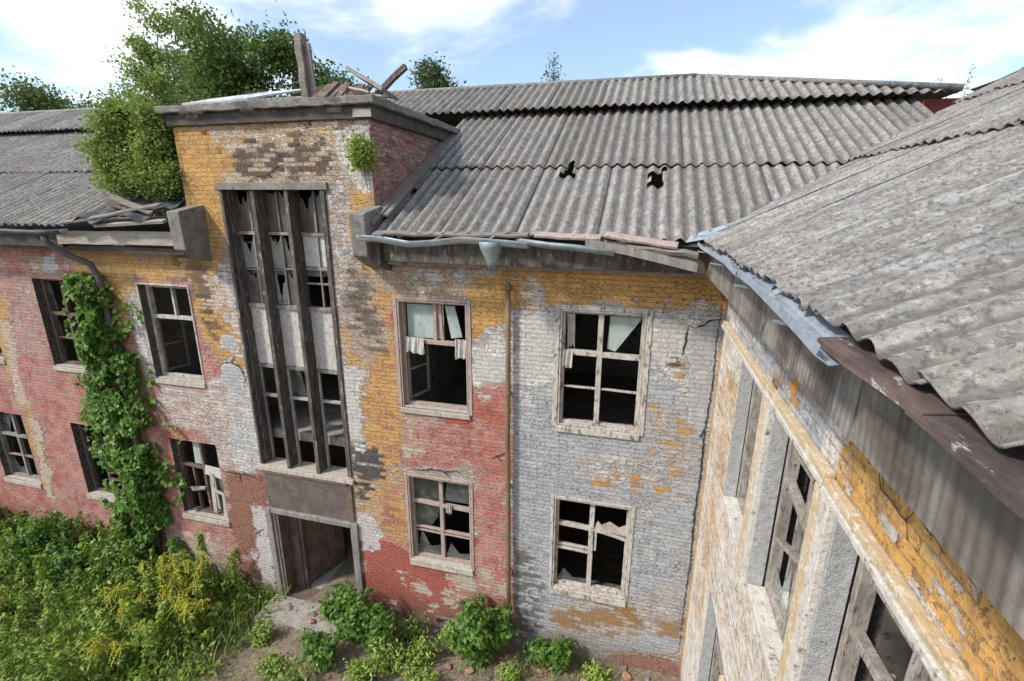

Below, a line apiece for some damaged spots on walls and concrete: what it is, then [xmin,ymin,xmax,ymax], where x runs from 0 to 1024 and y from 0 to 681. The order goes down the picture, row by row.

spalling [219,132,370,185]
spalling [164,470,278,595]
spalling [205,263,245,398]
peeling [344,366,373,445]
leakage [351,443,387,500]
peeling [359,520,381,552]
peeling [397,567,512,625]
peeling [471,287,555,410]
peeling [583,305,724,536]
crack [678,296,724,651]
peeling [879,513,902,556]
peeling [908,527,980,657]